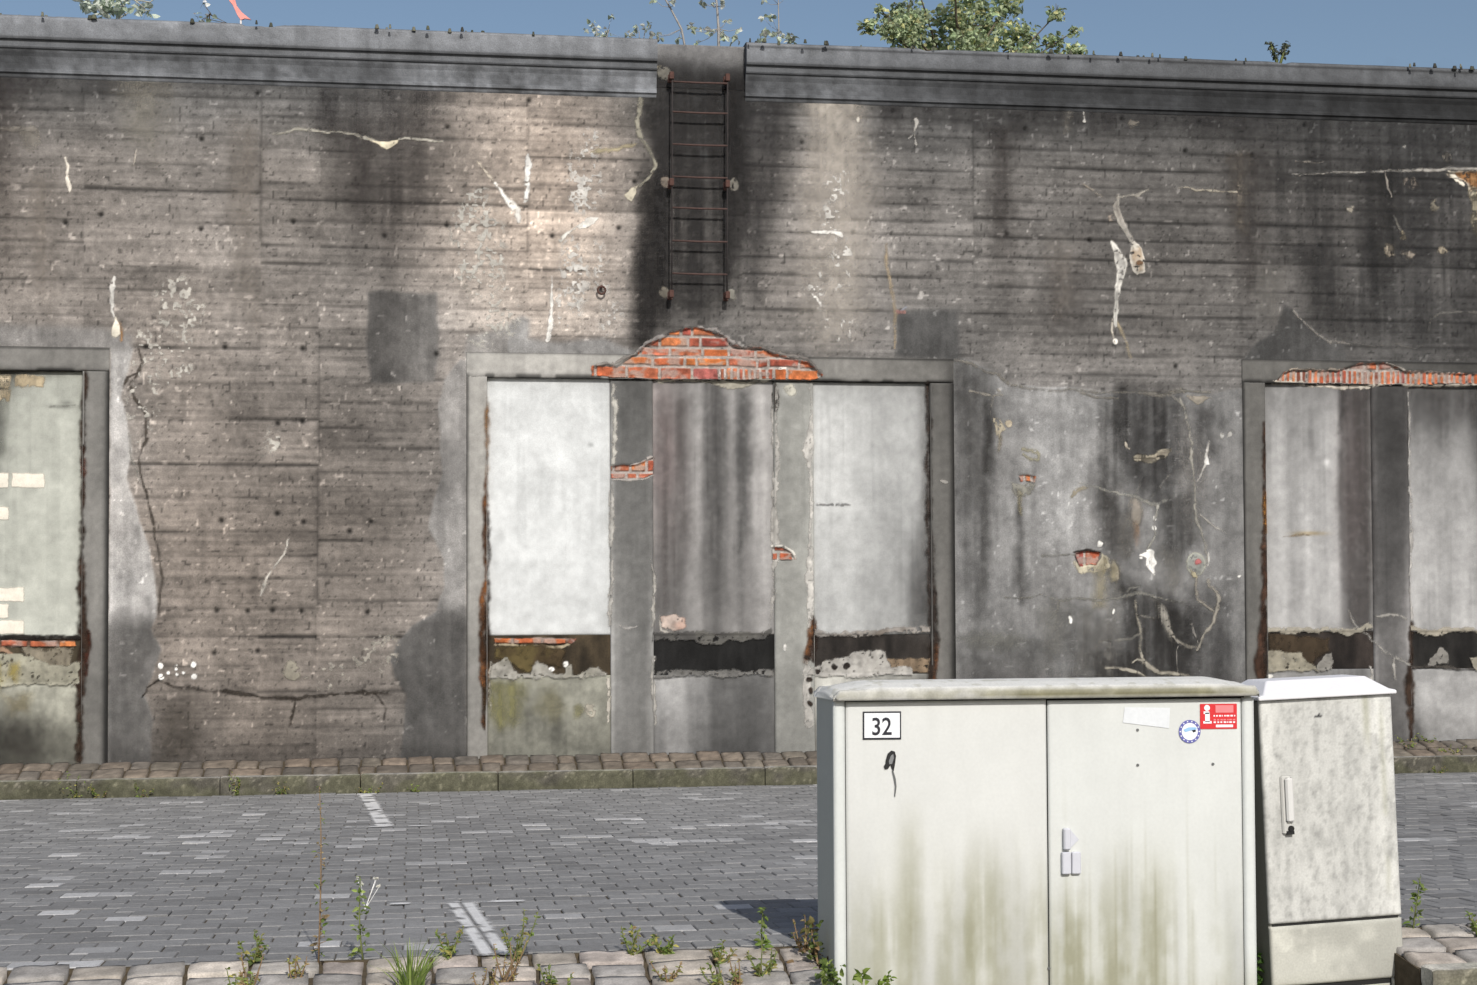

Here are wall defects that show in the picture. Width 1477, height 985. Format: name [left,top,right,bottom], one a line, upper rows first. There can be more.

leakage [546,74,780,342]
spalling [1108,190,1147,348]
flaking render [0,587,80,687]
crack [124,349,163,611]
crack [142,679,388,724]
crack [261,541,288,593]
flaking render [591,326,930,728]
crack [1005,388,1221,677]
leakage [1097,568,1192,677]
leakage [1114,388,1204,552]
corrosion [1254,422,1268,679]
flaking render [1274,362,1477,671]